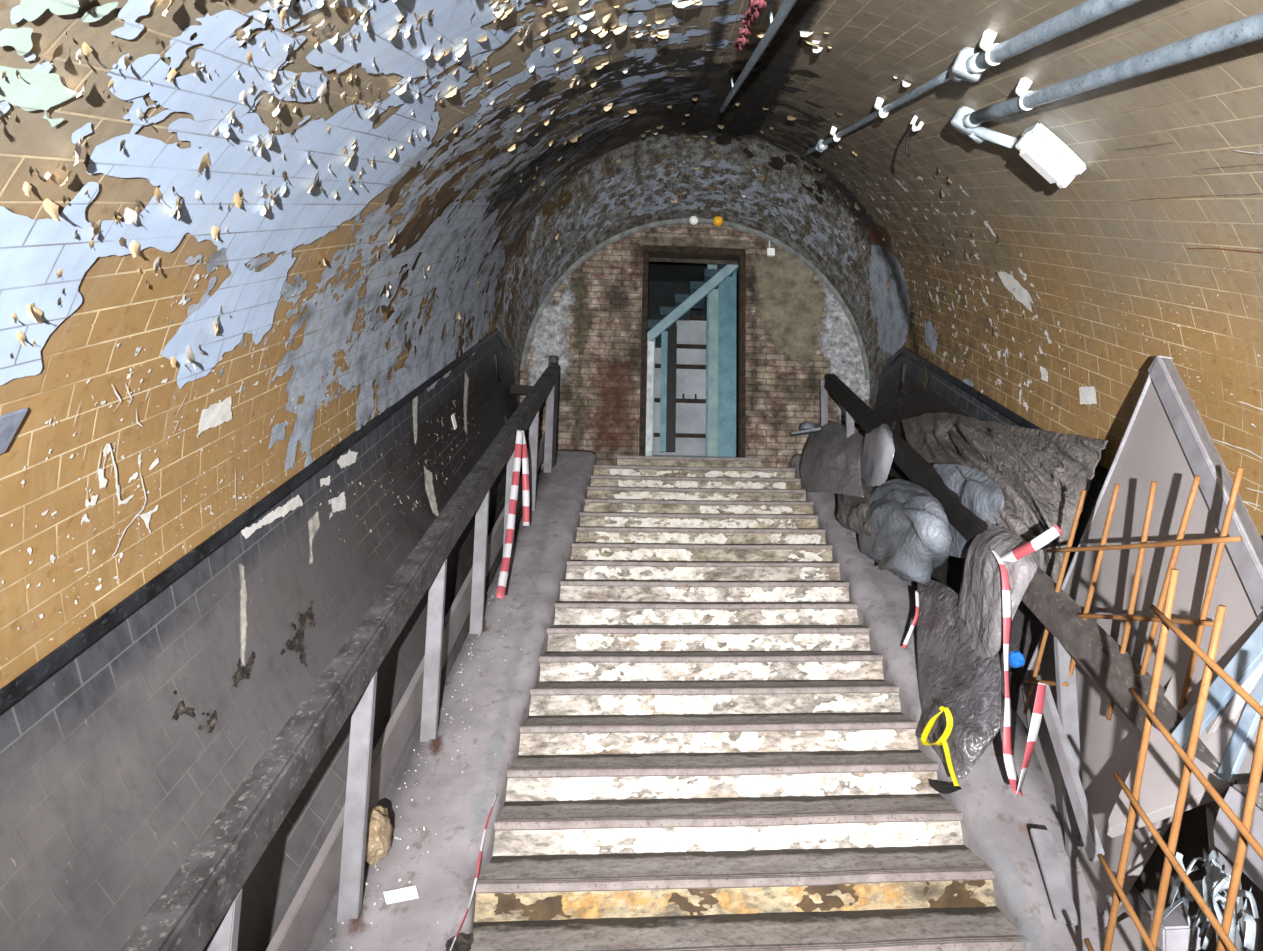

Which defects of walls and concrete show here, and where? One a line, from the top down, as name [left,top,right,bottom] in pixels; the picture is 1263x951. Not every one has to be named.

peeling [0,0,1063,539]
damp [824,174,929,389]
crack [111,383,149,427]
damp [530,274,592,450]
damp [819,287,870,402]
peeling [1063,356,1098,405]
crack [73,403,147,557]
spalling [281,601,316,667]
spalling [232,652,255,687]
corrosion [562,891,690,918]
corrosion [716,891,759,914]
corrosion [832,884,904,911]